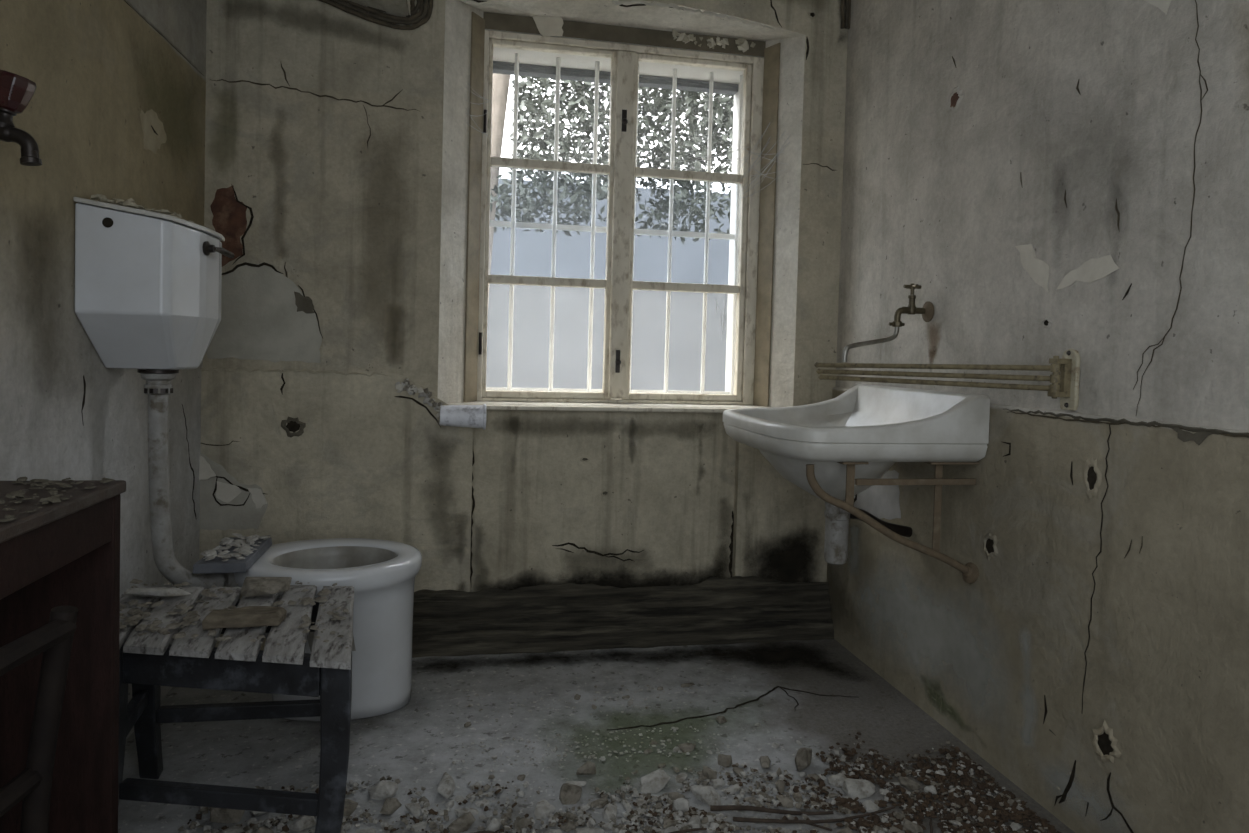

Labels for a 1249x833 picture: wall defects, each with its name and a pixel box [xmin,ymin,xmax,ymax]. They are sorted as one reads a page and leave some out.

crack [213,64,418,147]
peeling [140,109,167,154]
peeling [1015,244,1120,293]
crack [1082,0,1208,710]
spalling [1007,409,1249,445]
spalling [1084,458,1102,500]
crack [552,542,644,561]
water stain [493,562,726,590]
water stain [753,532,818,582]
crack [607,686,851,730]
spalling [1092,720,1121,764]
crack [1054,760,1134,833]